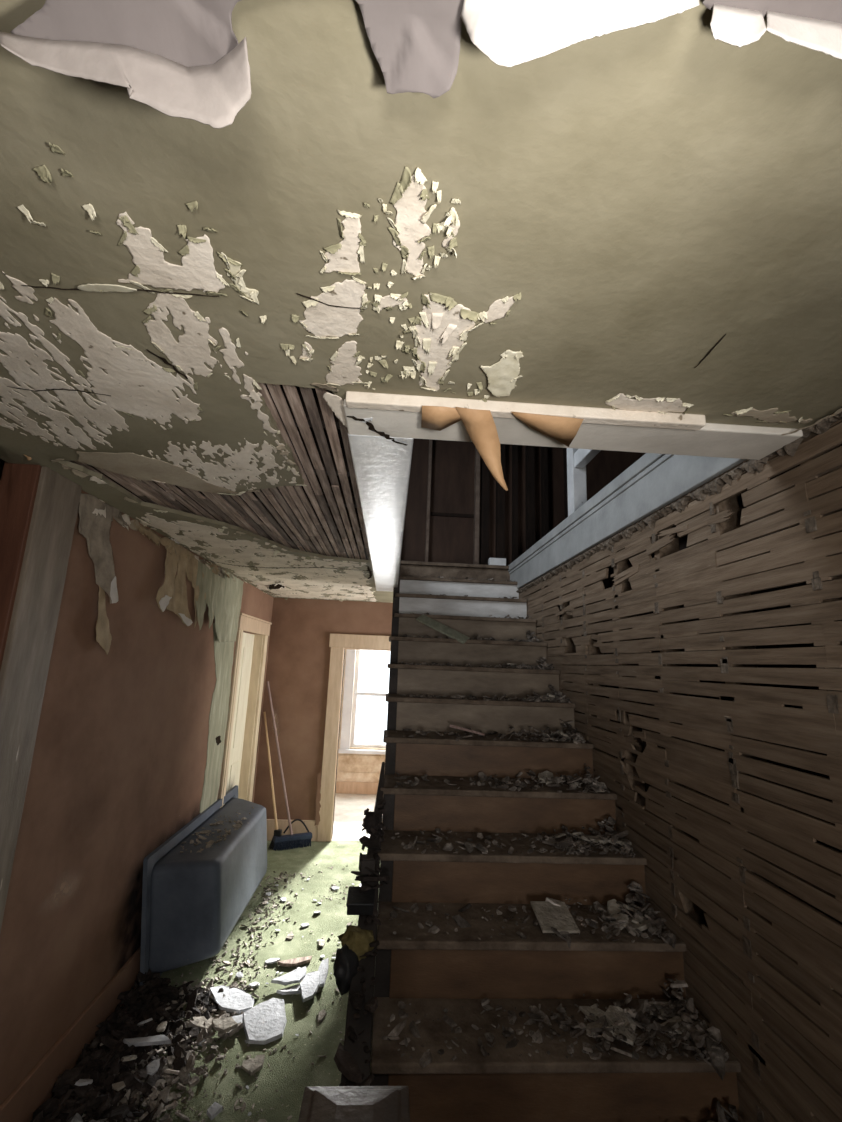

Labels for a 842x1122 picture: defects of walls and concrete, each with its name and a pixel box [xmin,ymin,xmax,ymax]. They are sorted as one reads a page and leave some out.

peeling [280,166,524,428]
crack [694,334,726,368]
peeling [0,201,378,643]
crack [347,416,407,446]
peeling [605,393,694,415]
peeling [724,407,813,424]